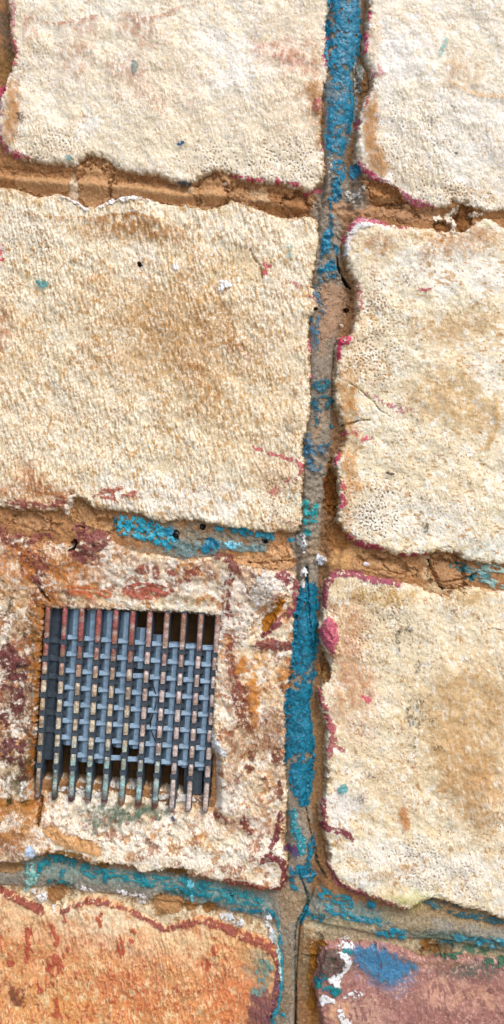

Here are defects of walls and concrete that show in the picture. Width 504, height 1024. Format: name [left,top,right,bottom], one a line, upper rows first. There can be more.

crack [294,806,326,1024]